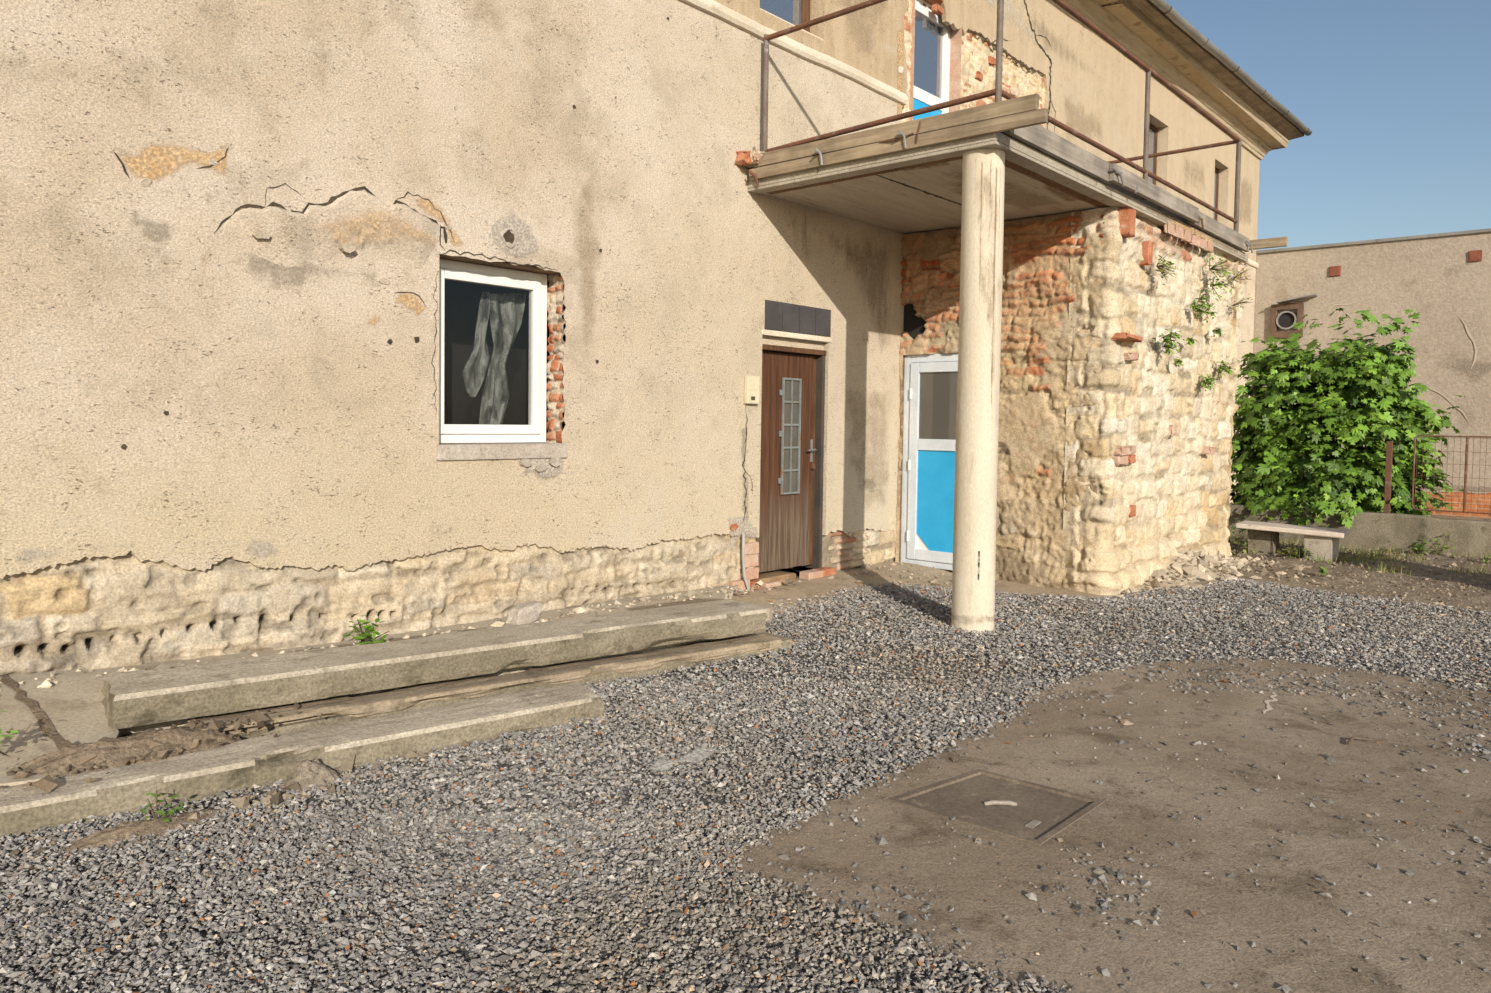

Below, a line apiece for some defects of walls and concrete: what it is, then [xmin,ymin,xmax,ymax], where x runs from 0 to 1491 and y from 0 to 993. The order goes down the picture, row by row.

flaking render [897,0,913,123]
flaking render [960,31,1046,126]
crack [968,0,1056,131]
flaking render [110,142,232,187]
crack [214,183,556,411]